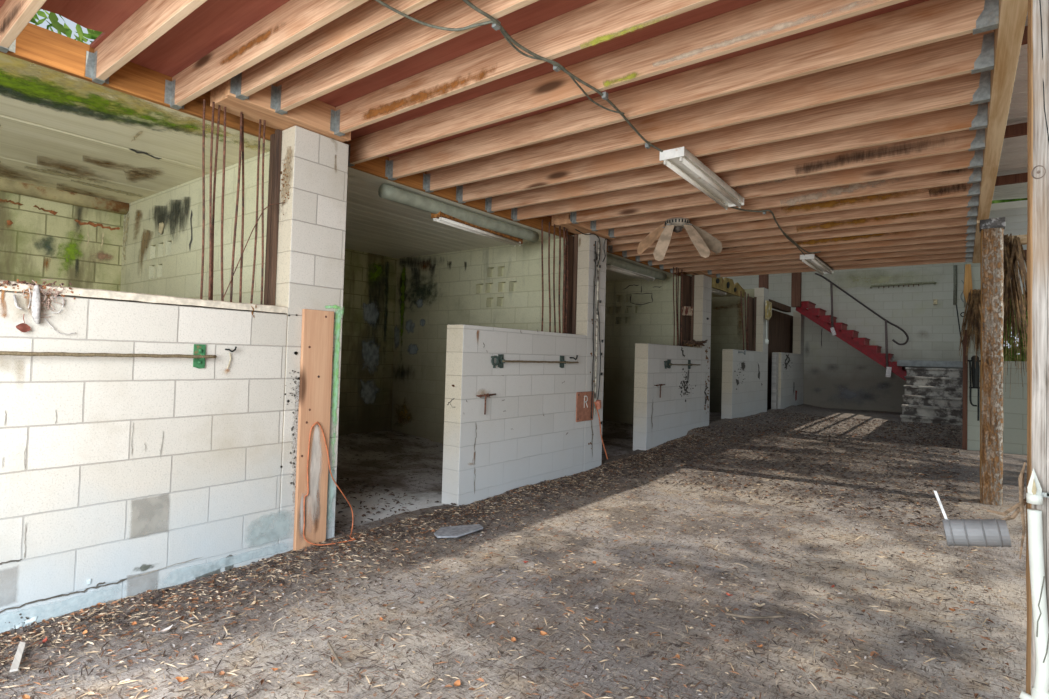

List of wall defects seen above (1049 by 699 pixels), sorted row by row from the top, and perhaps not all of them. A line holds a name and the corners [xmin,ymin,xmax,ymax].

damp [154,198,192,249]
damp [361,258,437,404]